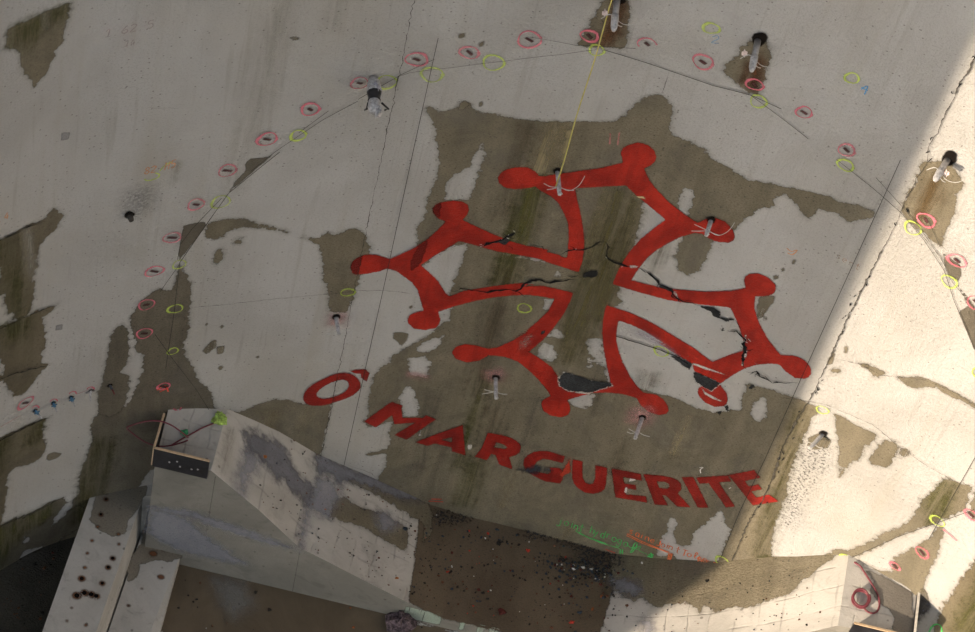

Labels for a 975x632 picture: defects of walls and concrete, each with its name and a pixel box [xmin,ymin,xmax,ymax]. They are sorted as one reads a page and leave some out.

crack [453,231,700,306]
water stain [0,208,288,581]
spalling [558,372,613,394]
water stain [230,94,975,632]
crack [616,336,688,364]
spalling [670,356,731,415]
spalling [701,306,734,331]
crack [729,320,955,481]